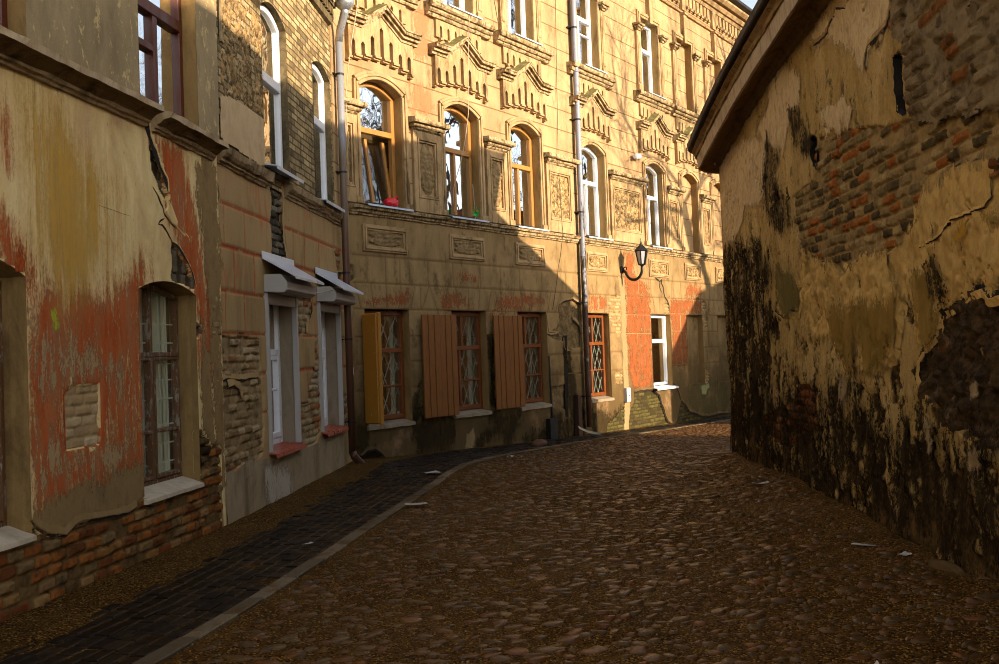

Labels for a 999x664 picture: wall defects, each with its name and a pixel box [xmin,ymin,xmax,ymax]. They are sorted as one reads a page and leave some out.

crack [145,123,197,287]
spalling [220,0,263,117]
flaking render [795,0,999,271]
crack [919,174,992,248]
peeling [0,137,265,623]
damp [722,132,999,583]
spalling [911,291,999,451]